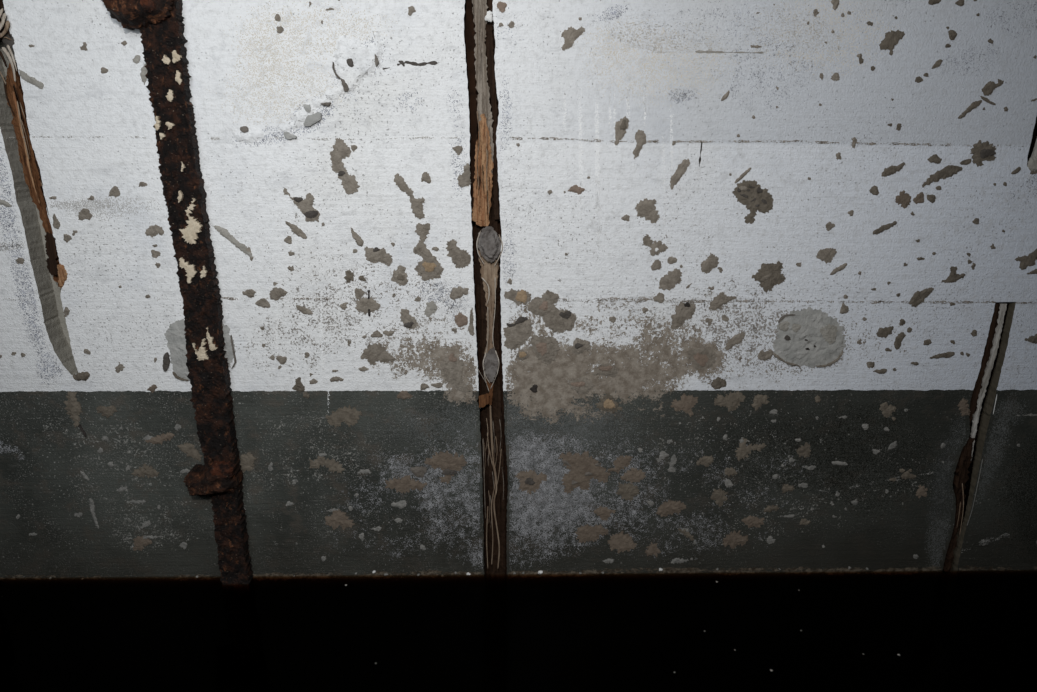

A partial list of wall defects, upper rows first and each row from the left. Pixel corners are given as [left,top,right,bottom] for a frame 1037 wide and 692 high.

spalling [485,1,515,28]
spalling [53,195,94,243]
peeling [503,173,976,559]
efflorescence [319,399,483,570]
damp [507,393,966,580]